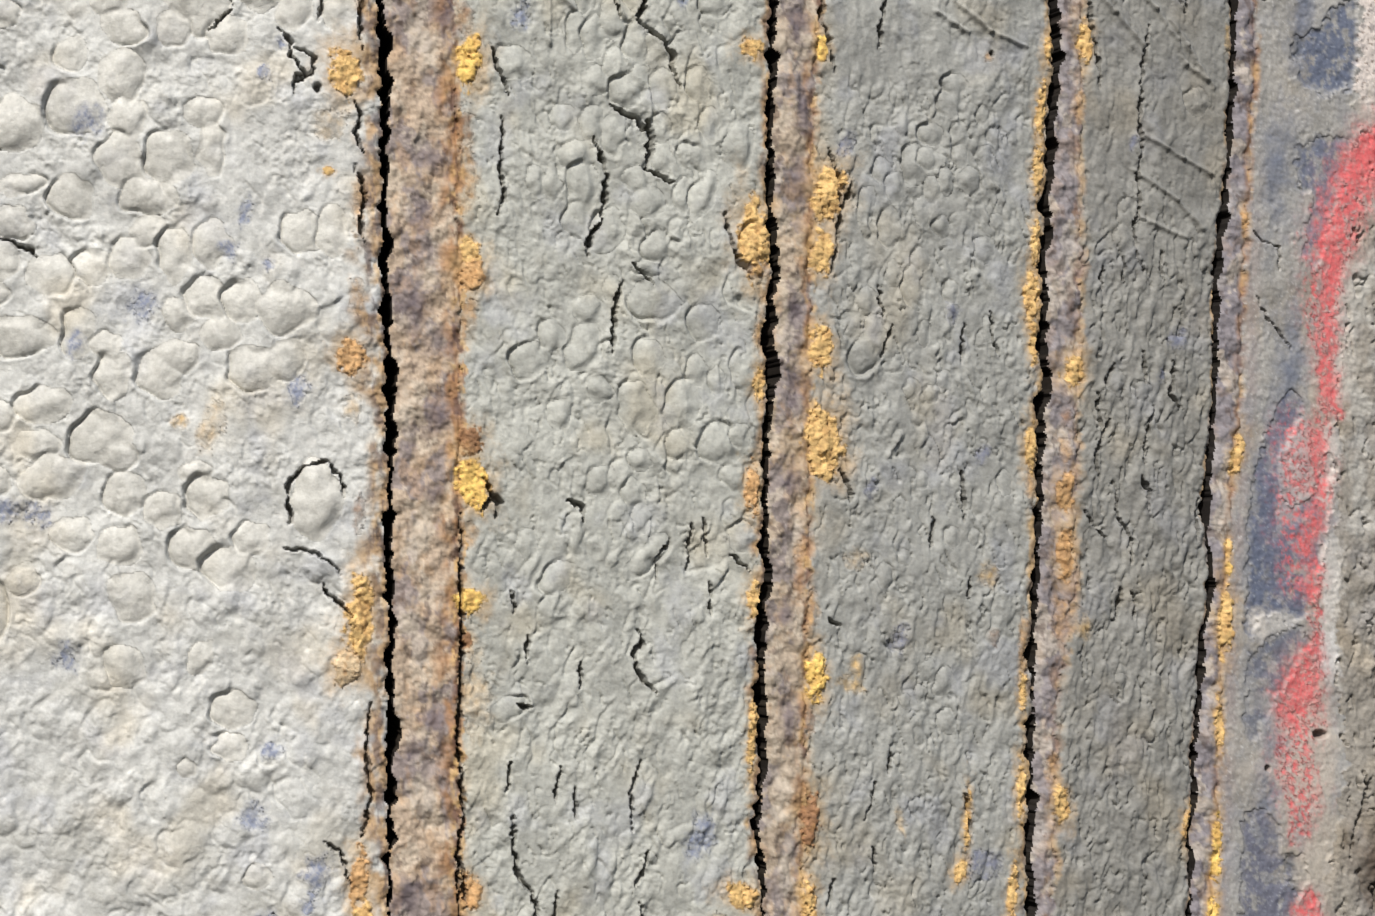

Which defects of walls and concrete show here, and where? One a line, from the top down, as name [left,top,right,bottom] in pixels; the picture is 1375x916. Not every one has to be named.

crack [584,103,676,257]
rust [736,191,773,286]
rust [807,166,849,279]
rust [1022,220,1041,367]
crack [283,458,354,619]
crack [323,0,402,916]
rust [454,427,493,549]
rust [453,589,495,743]
crack [653,0,782,916]
rust [746,579,760,619]
crack [1023,0,1165,916]
crack [1084,0,1281,916]